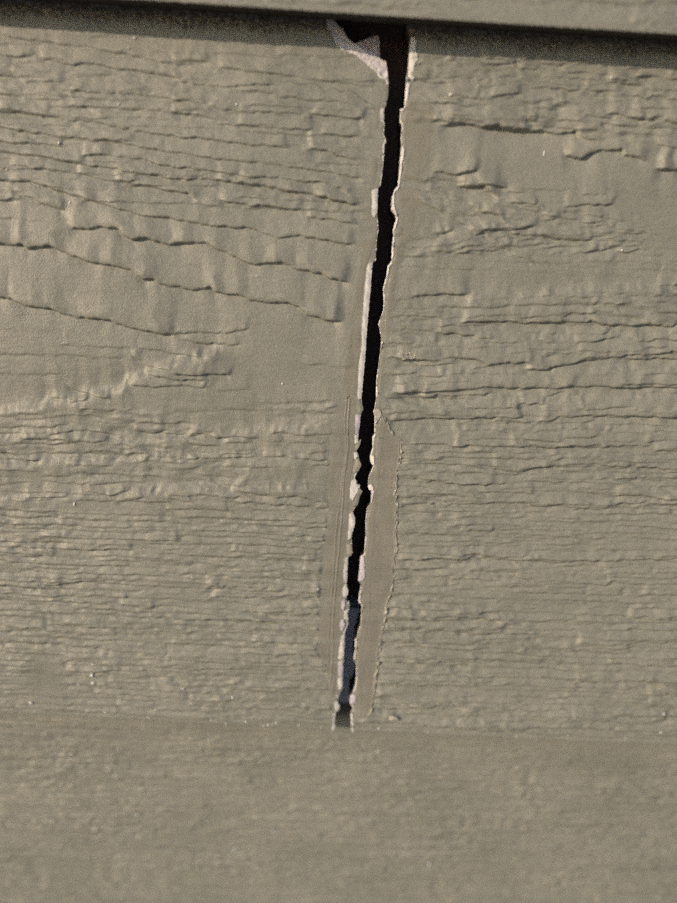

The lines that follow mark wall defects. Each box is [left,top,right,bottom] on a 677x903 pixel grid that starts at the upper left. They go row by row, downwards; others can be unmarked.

crack [279,19,407,587]
spalling [326,20,389,85]
peeling [332,37,417,732]